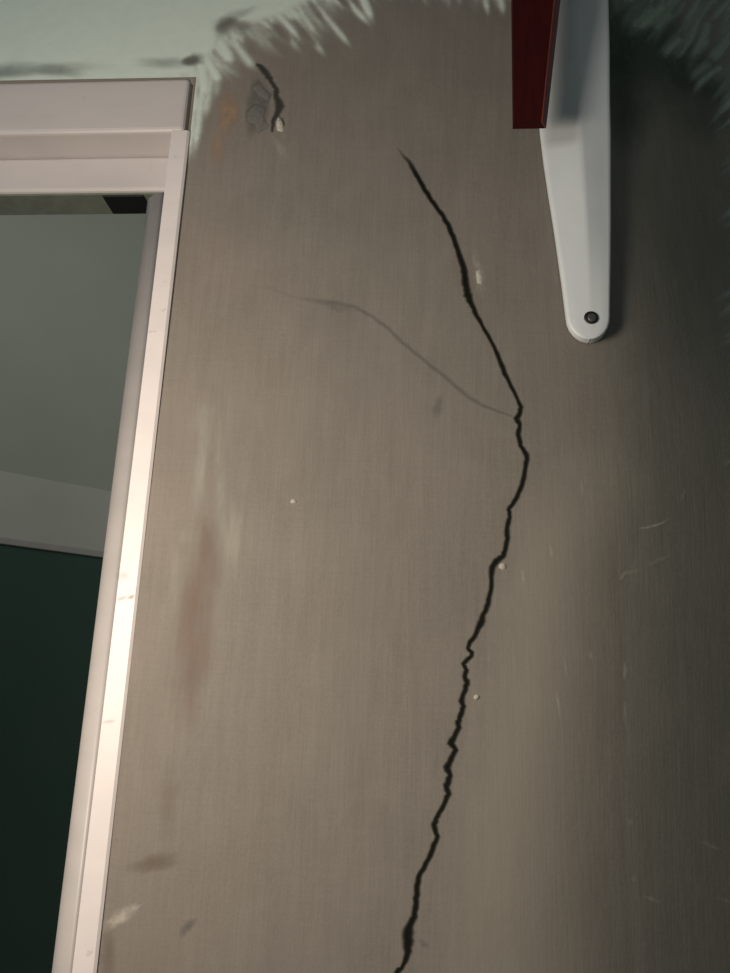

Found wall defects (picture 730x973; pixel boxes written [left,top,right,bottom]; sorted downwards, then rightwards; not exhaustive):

spalling [245,64,284,134]
crack [394,159,529,973]